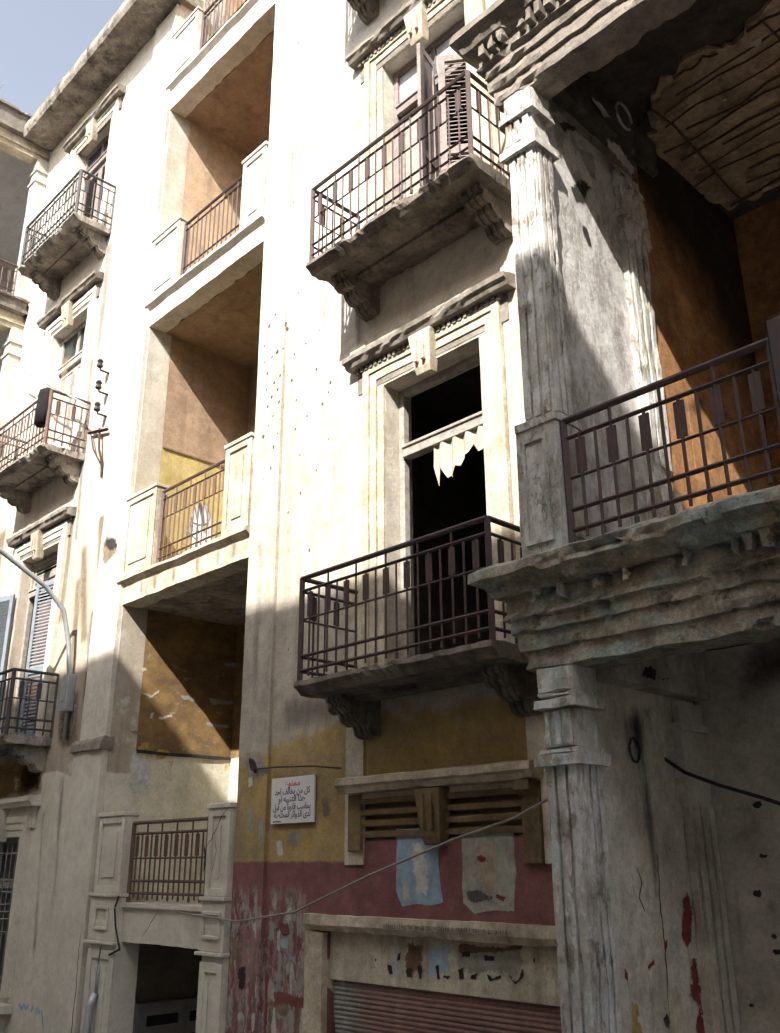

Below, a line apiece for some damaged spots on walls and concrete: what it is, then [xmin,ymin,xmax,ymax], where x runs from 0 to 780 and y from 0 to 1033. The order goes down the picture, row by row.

spalling [646,0,780,211]
peeling [231,891,309,1033]
peeling [632,1002,643,1033]
peeling [664,892,705,1033]